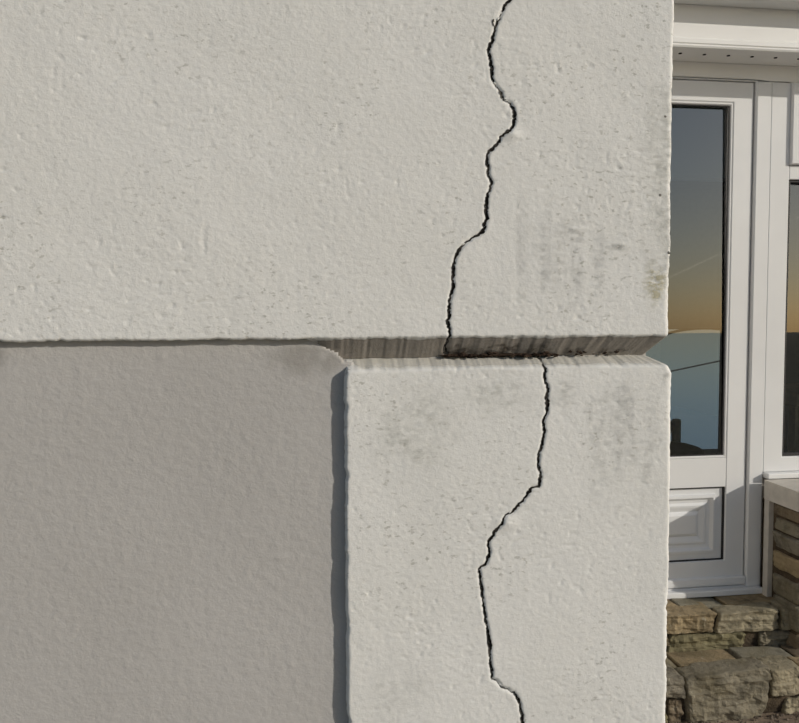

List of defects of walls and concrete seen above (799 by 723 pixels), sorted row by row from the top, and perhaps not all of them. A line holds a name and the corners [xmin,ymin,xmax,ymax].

crack [443,0,517,353]
crack [478,357,550,723]